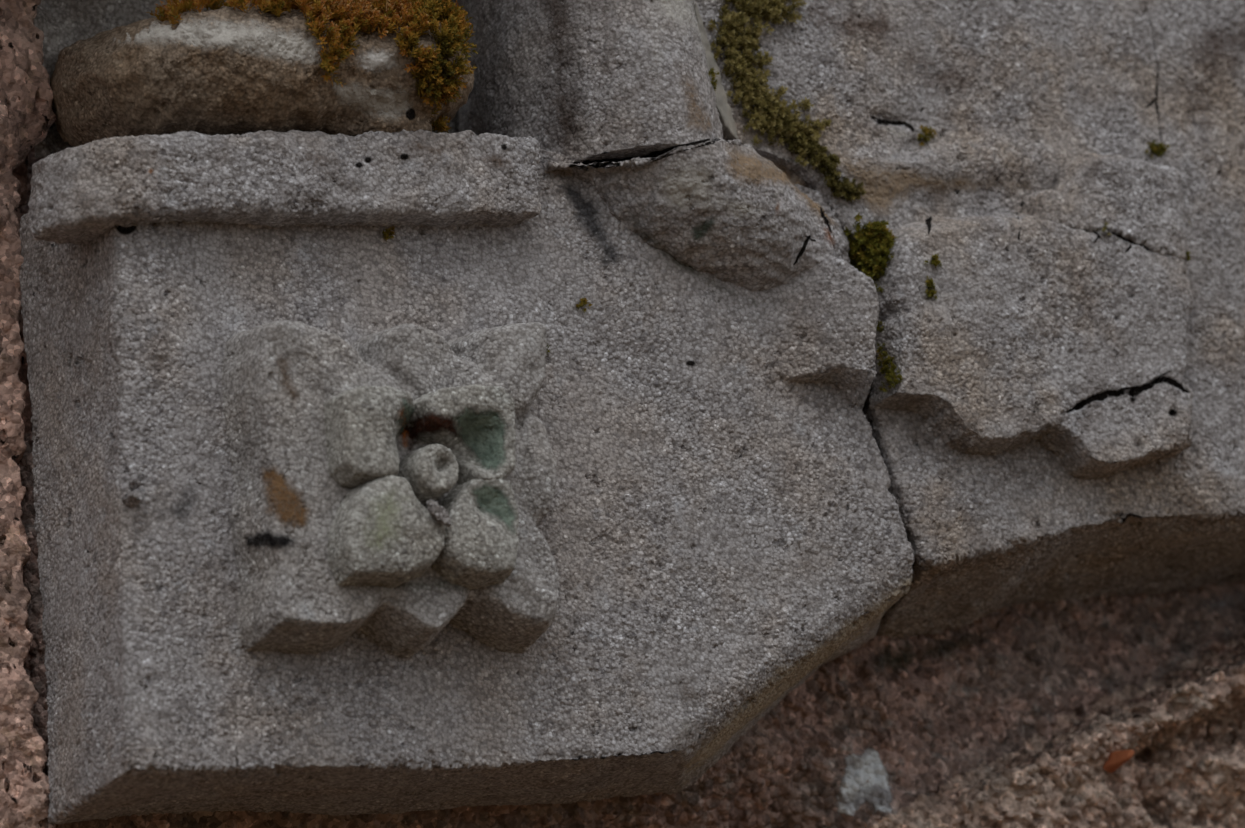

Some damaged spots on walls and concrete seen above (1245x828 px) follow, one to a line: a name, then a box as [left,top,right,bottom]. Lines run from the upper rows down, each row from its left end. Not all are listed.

crack [570,139,715,165]
crack [1080,229,1152,252]
crack [1067,370,1189,412]